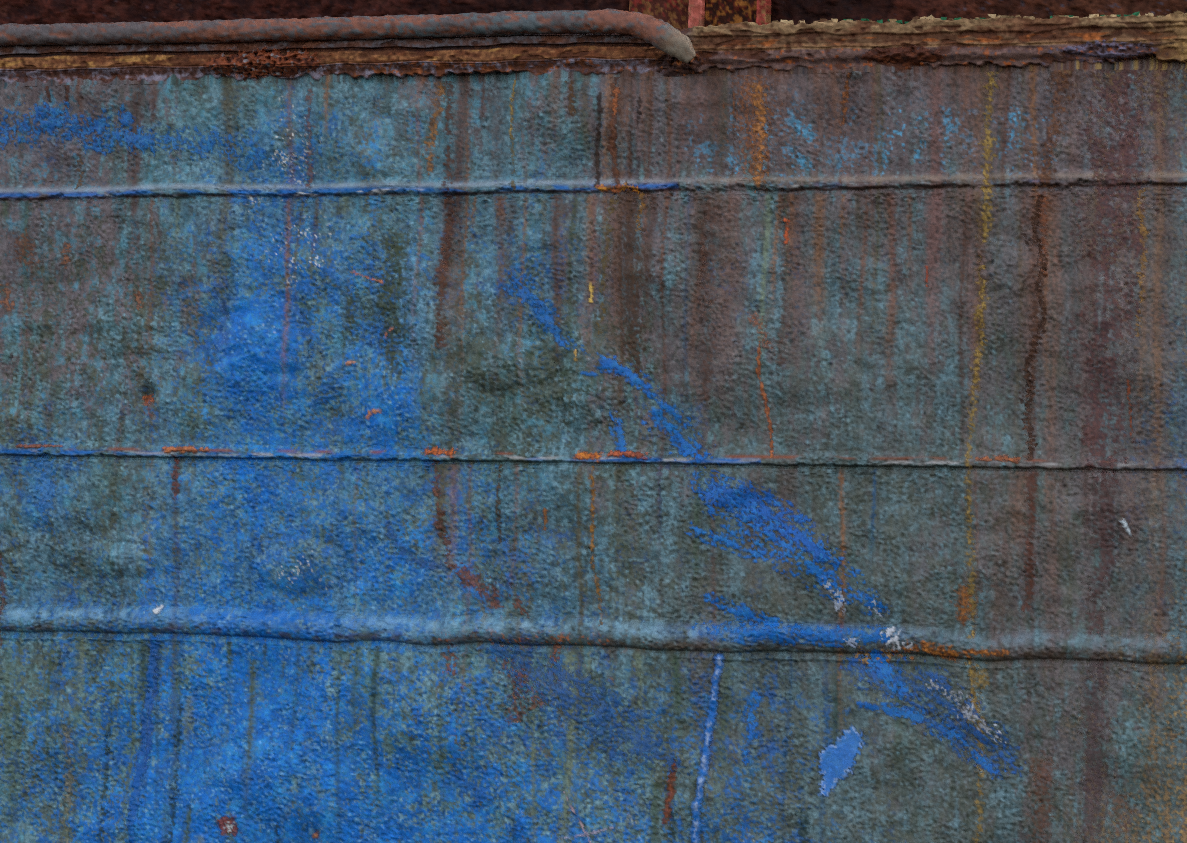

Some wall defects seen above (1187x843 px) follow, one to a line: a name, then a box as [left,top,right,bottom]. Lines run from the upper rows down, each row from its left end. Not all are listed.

rust [565,80,576,116]
rust [655,52,703,76]
rust [723,75,781,193]
rust [840,43,942,125]
rust [424,81,455,348]
rust [594,77,651,374]
rust [1037,38,1167,633]
rust [756,341,774,457]
rust [162,446,210,496]
rust [425,446,528,615]
rust [217,817,237,841]